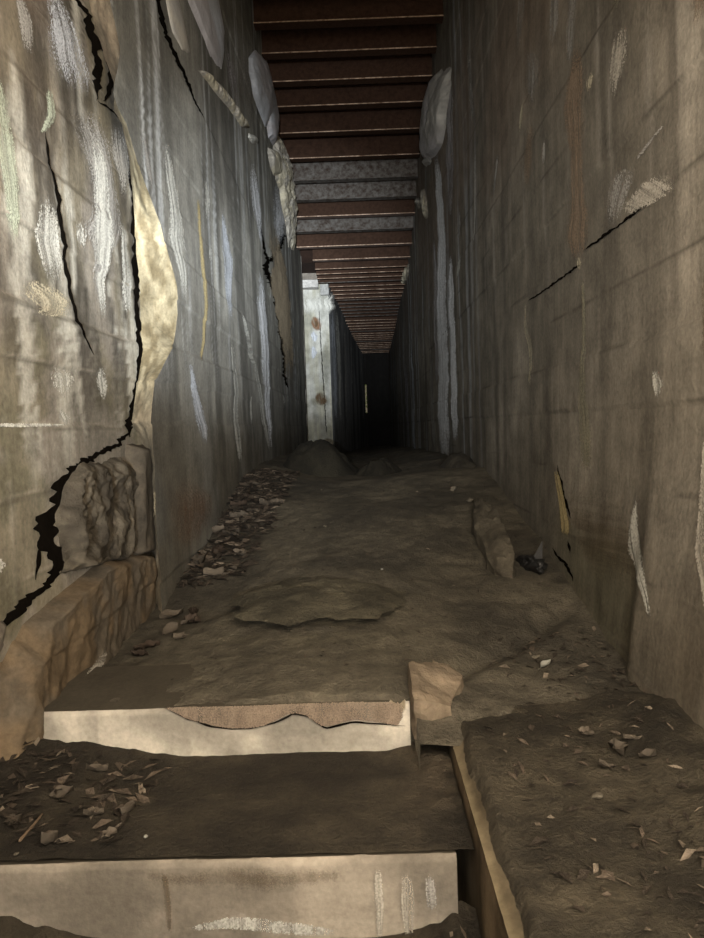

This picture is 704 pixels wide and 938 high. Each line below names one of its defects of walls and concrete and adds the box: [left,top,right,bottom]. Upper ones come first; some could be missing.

crack [76,0,118,117]
crack [528,202,649,301]
crack [3,132,143,626]
water stain [652,372,663,397]
spalling [0,444,158,761]
water stain [695,442,704,606]